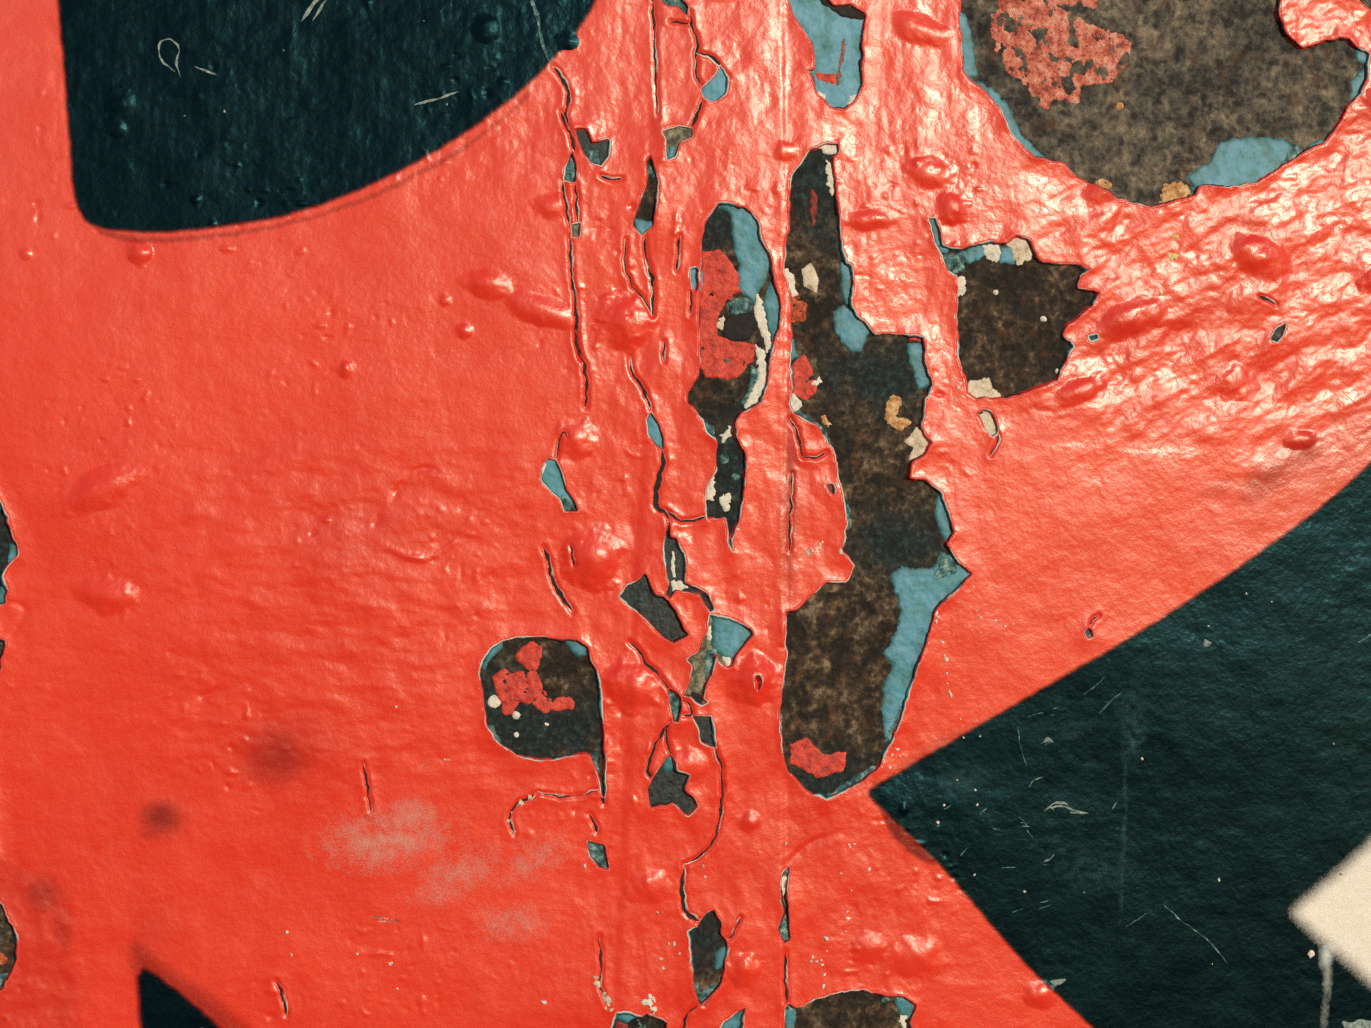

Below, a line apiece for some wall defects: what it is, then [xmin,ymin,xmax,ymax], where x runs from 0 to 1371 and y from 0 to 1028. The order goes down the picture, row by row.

peeling [787,0,868,111]
peeling [958,0,1371,209]
crack [553,66,622,459]
crack [622,236,695,410]
peeling [927,216,1101,438]
crack [653,451,705,522]
peeling [685,141,974,802]
peeling [477,635,608,798]
crack [544,545,576,612]
crack [629,643,693,780]
peeling [617,520,755,749]
crack [680,749,726,921]